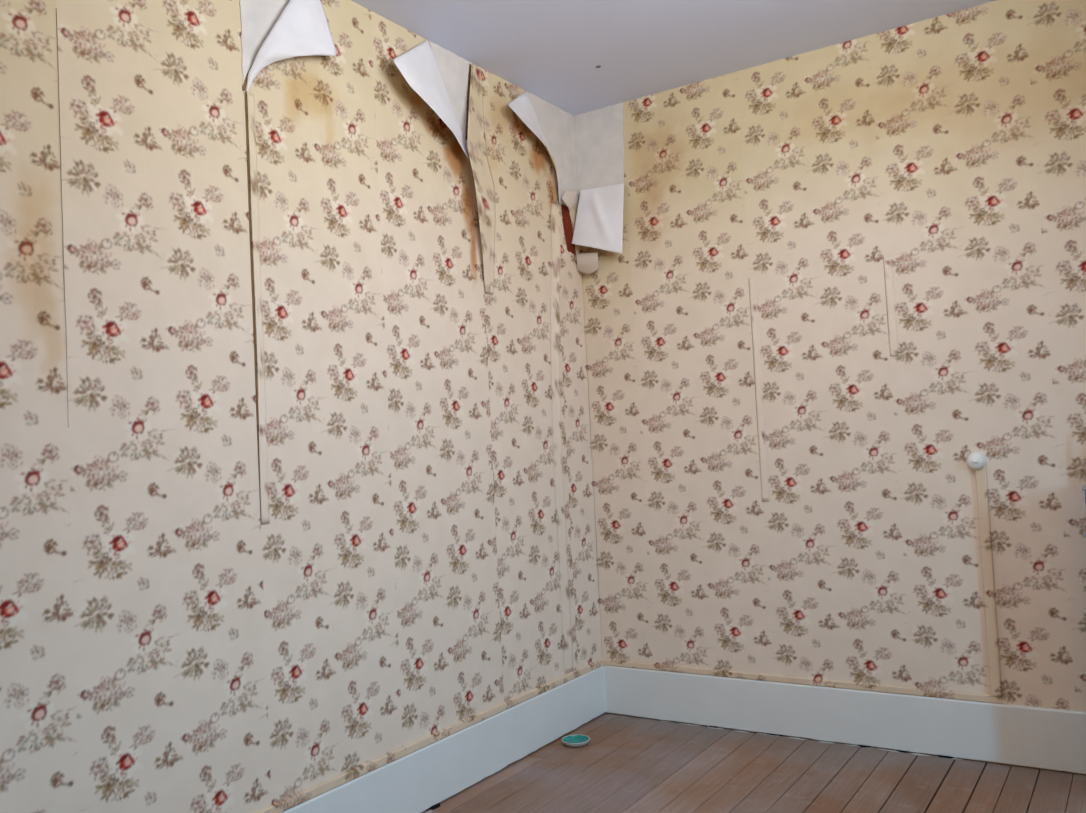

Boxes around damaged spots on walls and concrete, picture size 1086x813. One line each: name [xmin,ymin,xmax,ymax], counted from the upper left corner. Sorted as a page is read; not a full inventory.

flaking render [239,0,290,93]
flaking render [428,40,473,153]
flaking render [525,91,624,206]